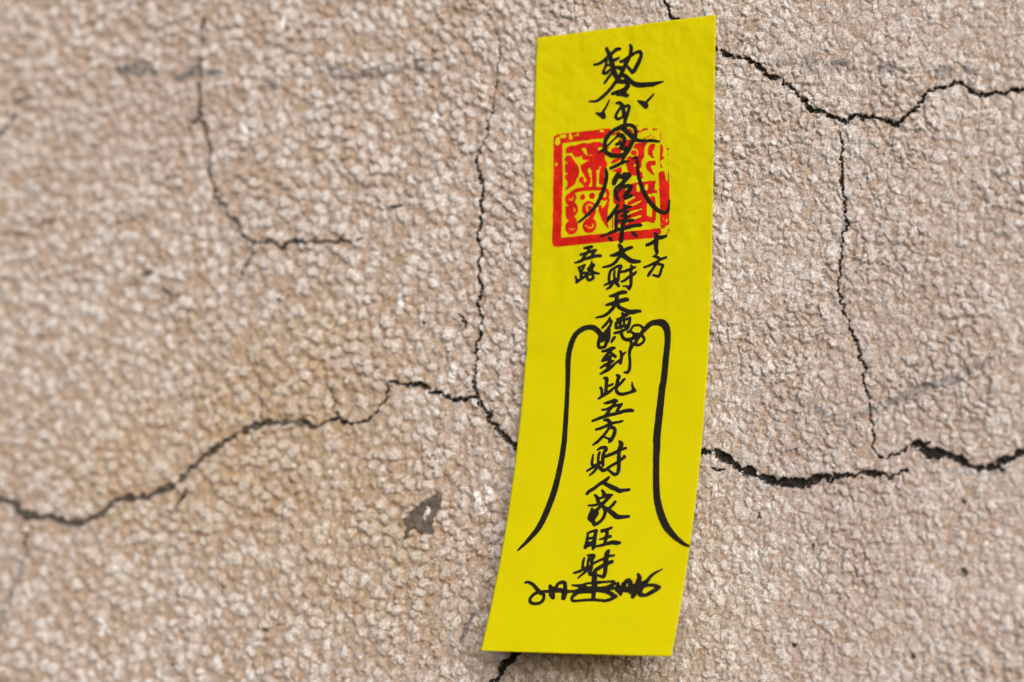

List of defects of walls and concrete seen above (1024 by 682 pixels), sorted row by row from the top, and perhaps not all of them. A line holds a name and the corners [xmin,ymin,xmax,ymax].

crack [662,0,680,20]
crack [0,6,518,559]
crack [701,47,1024,489]
crack [489,652,523,682]